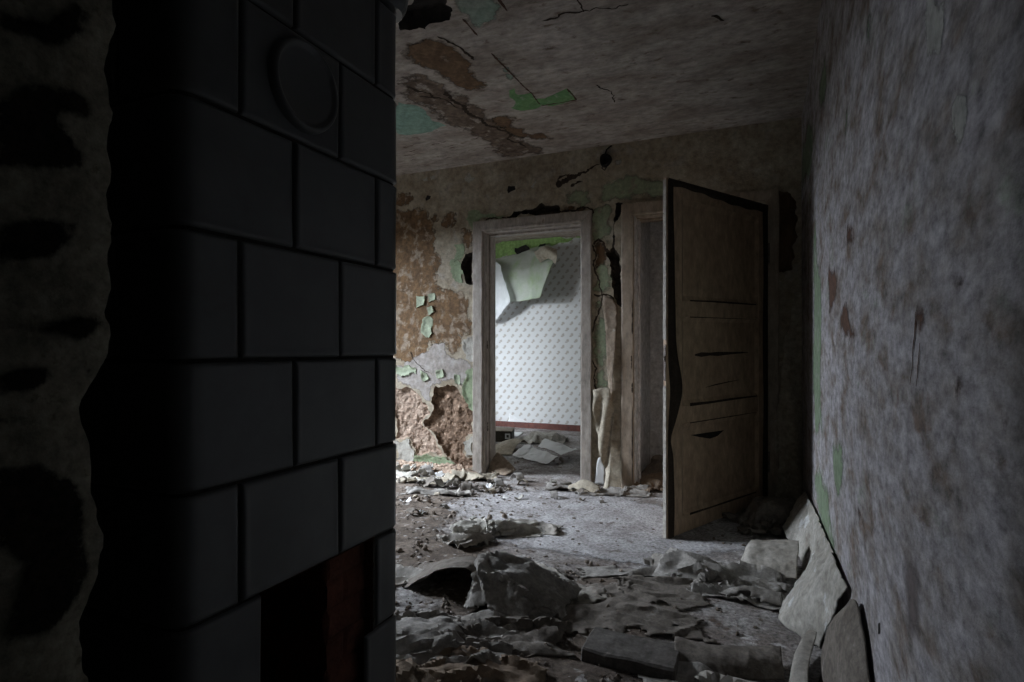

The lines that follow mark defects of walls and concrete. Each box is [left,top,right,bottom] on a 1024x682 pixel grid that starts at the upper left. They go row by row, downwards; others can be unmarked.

crack [543,0,628,21]
peeling [509,88,575,111]
peeling [396,102,453,160]
peeling [416,293,436,338]
peeling [450,244,473,285]
crack [541,164,614,389]
spalling [592,202,633,388]
spalling [394,365,473,468]